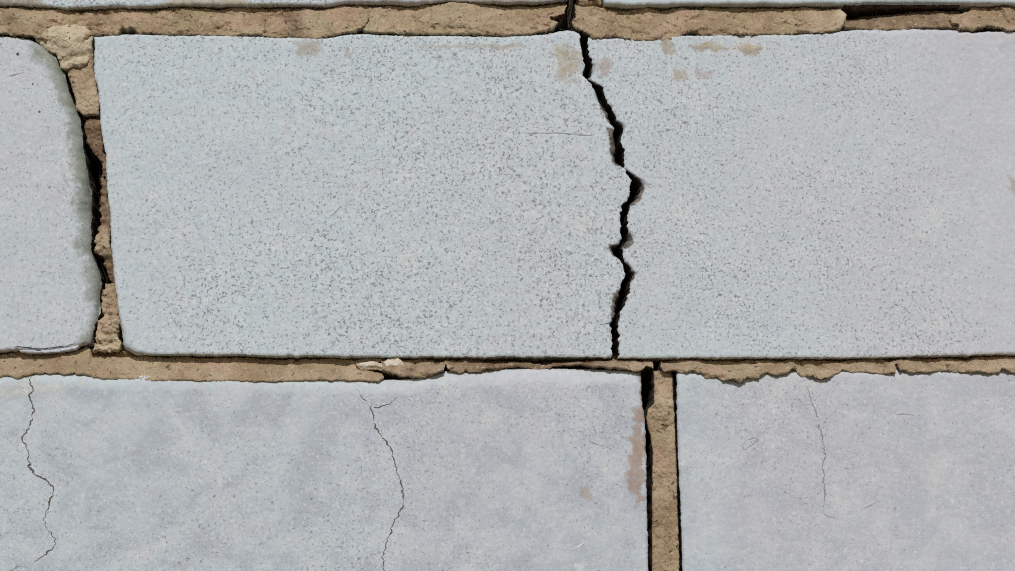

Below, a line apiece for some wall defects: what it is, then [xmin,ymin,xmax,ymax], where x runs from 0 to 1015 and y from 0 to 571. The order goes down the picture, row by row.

crack [65,74,76,106]
crack [79,112,111,337]
crack [94,0,1015,368]
crack [9,376,56,571]
crack [360,395,404,571]
crack [641,360,661,571]
crack [672,373,682,571]
crack [806,387,833,518]